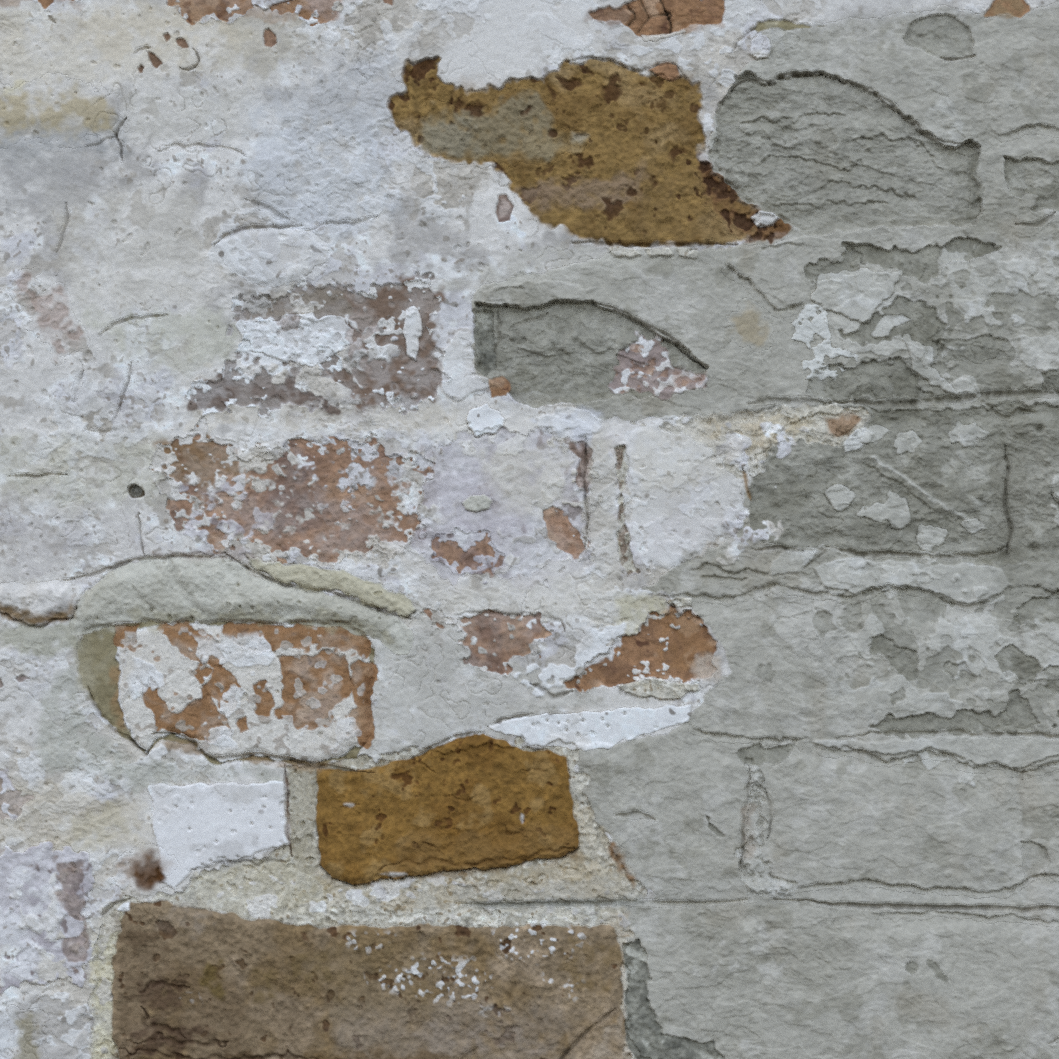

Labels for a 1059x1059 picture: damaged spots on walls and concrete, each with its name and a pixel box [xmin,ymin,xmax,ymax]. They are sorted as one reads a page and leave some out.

spalling [166,0,343,26]
spalling [589,0,726,42]
spalling [983,0,1031,18]
spalling [387,14,1059,577]
peeling [149,271,709,586]
crack [62,513,412,620]
crack [653,544,1059,613]
peeling [422,608,554,675]
spalling [563,600,718,700]
peeling [869,644,1059,740]
crack [688,723,1059,780]
spalling [77,620,726,1059]